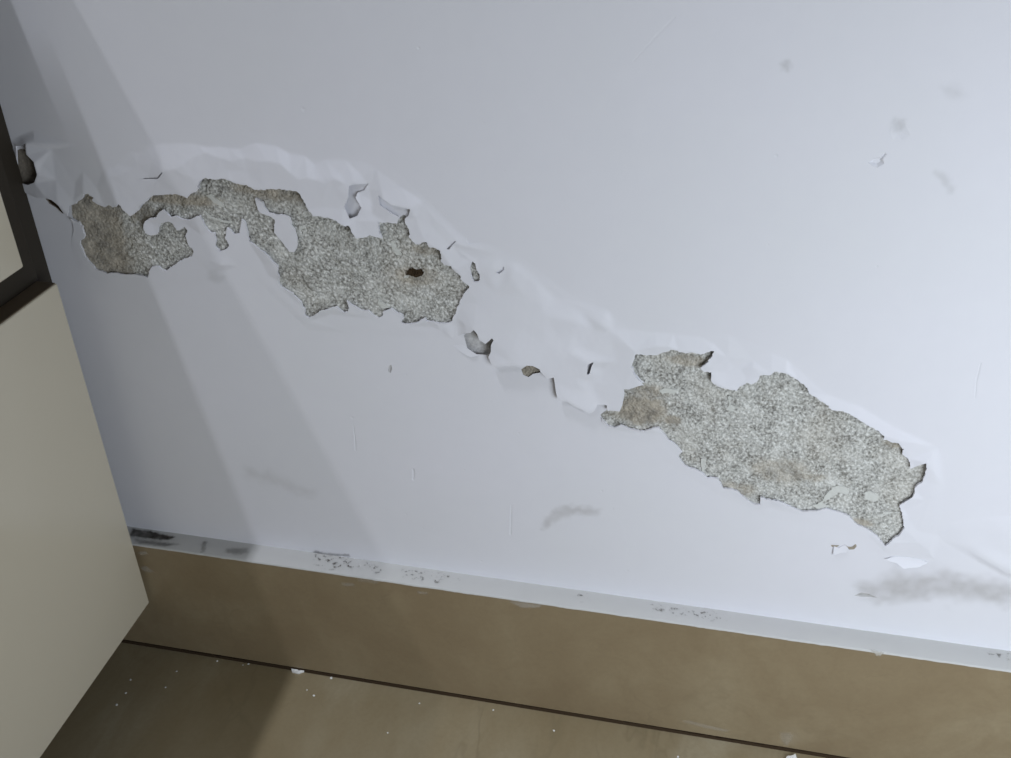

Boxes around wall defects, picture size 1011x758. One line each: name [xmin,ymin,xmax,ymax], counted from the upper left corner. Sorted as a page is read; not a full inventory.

peeling [11,129,480,339]
peeling [601,323,945,569]